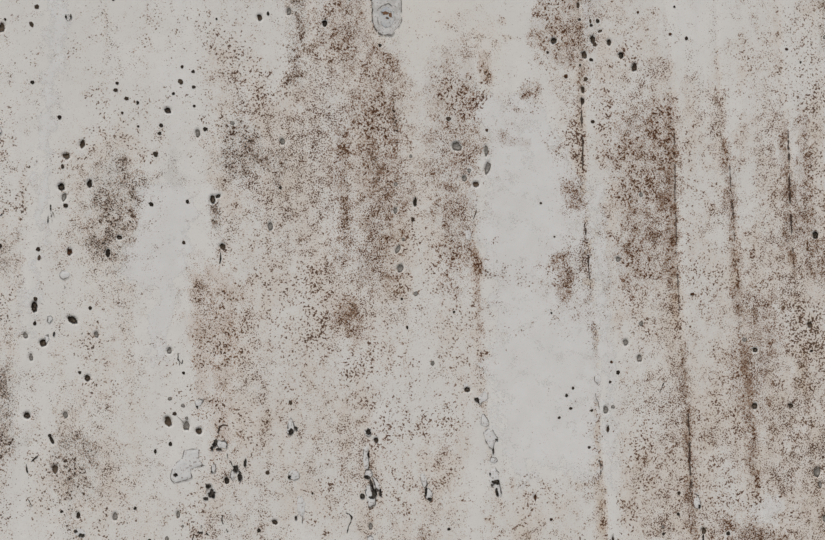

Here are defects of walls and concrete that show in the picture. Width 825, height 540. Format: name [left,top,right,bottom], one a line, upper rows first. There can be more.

spalling [371,0,402,47]
leakage [529,0,607,86]
leakage [214,109,297,192]
leakage [283,0,484,307]
leakage [778,112,825,279]
leakage [560,93,688,504]
leakage [719,130,789,497]
spalling [203,483,216,500]
peeling [210,439,228,450]
peeling [224,458,247,483]
peeling [360,428,382,508]
peeling [464,387,502,497]